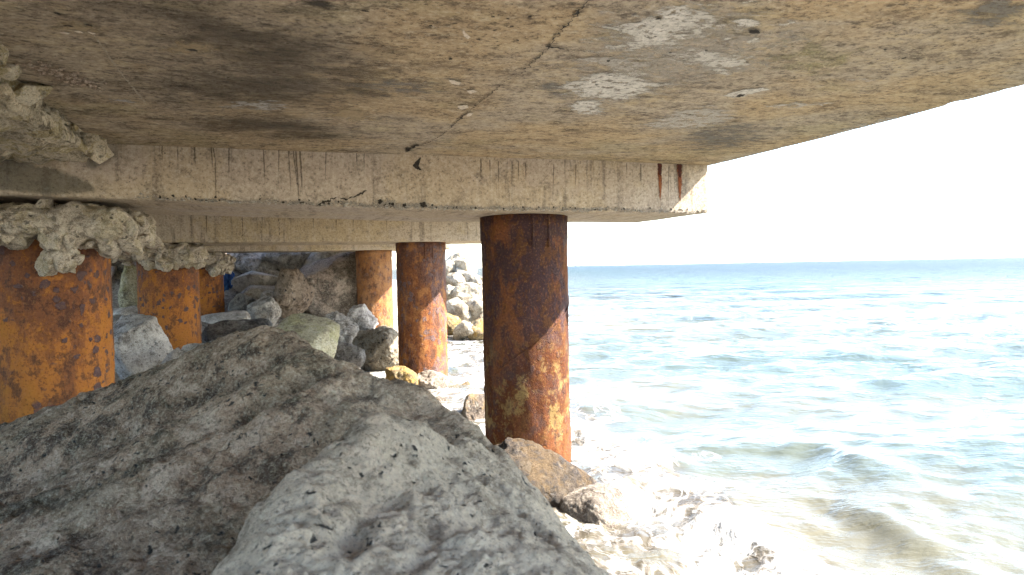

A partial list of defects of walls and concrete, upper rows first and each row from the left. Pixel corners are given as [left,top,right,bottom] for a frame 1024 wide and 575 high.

leakage [168,14,333,137]
leakage [304,1,339,10]
crack [422,0,619,145]
leakage [541,1,761,115]